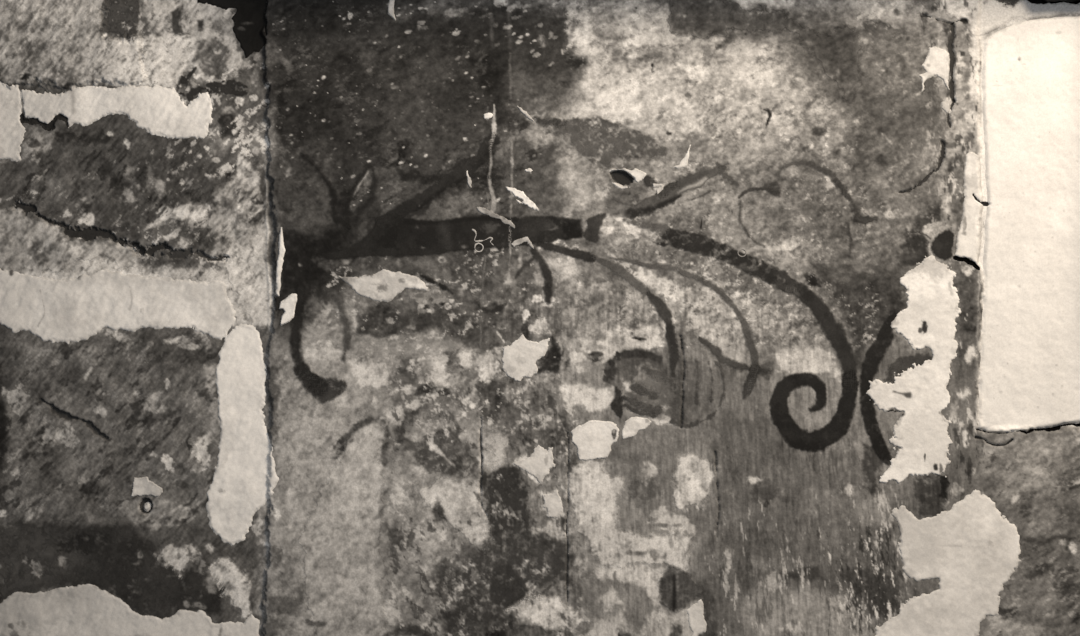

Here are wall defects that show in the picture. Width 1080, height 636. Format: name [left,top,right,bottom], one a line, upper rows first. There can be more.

peeling [197,0,267,58]
peeling [0,67,248,162]
crack [14,200,229,261]
peeling [0,153,297,636]
peeling [502,334,550,381]
peeling [866,152,984,483]
peeling [481,417,695,573]
peeling [875,489,1021,636]